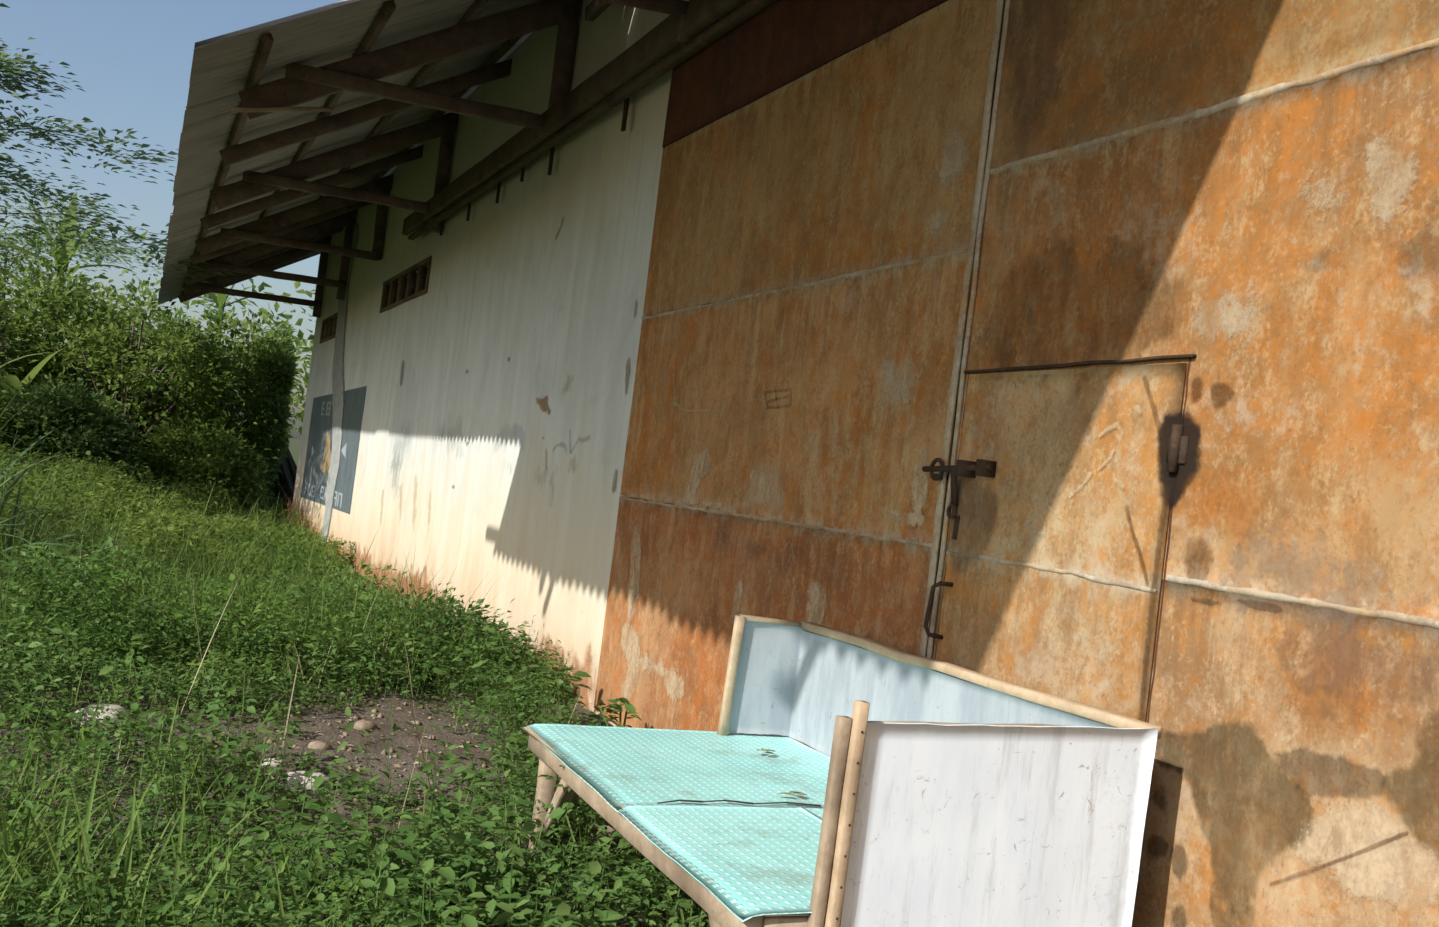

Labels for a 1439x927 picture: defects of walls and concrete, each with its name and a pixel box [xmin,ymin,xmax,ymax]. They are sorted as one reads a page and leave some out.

spalling [536,396,550,414]
corrosion [1158,413,1200,507]